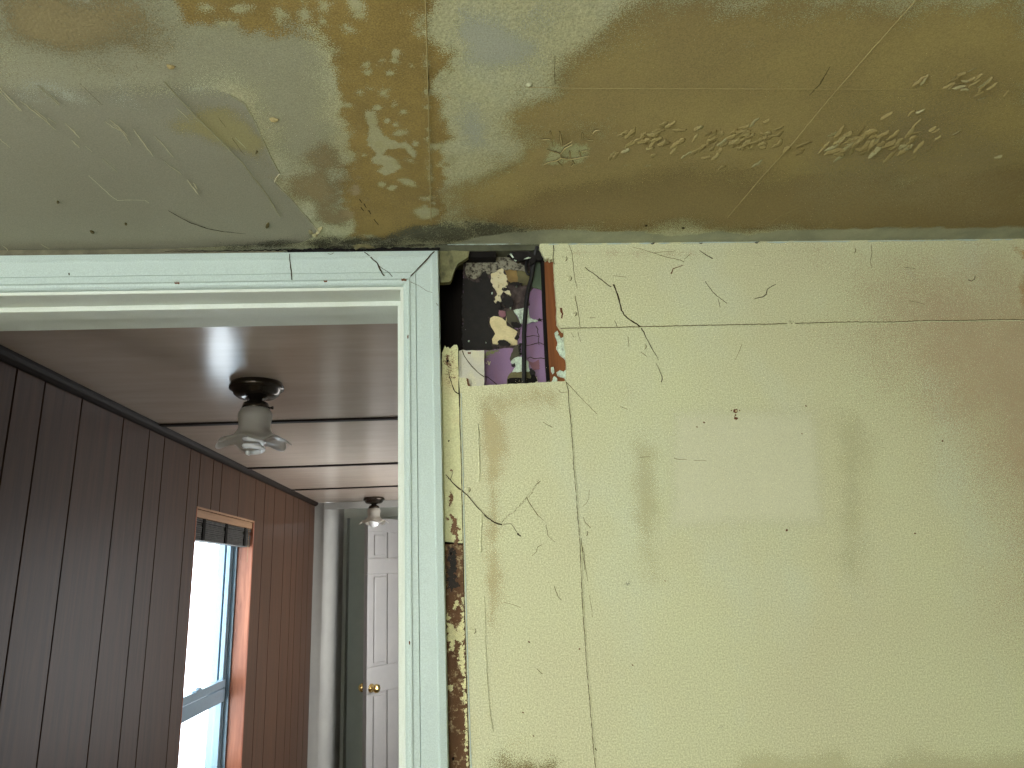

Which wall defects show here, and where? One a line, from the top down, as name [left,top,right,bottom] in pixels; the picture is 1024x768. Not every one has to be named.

leakage [0,0,1024,250]
crack [165,199,440,292]
spalling [439,257,566,393]
crack [526,243,1024,382]
leakage [748,239,1024,688]
crack [446,350,626,768]
peeling [446,595,470,767]